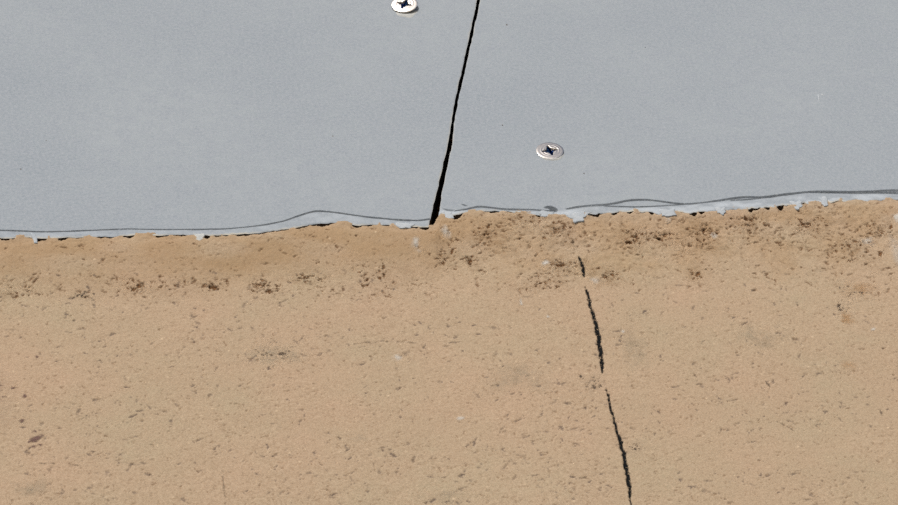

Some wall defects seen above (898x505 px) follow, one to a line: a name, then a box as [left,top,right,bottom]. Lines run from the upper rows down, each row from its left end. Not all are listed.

crack [578,256,632,505]